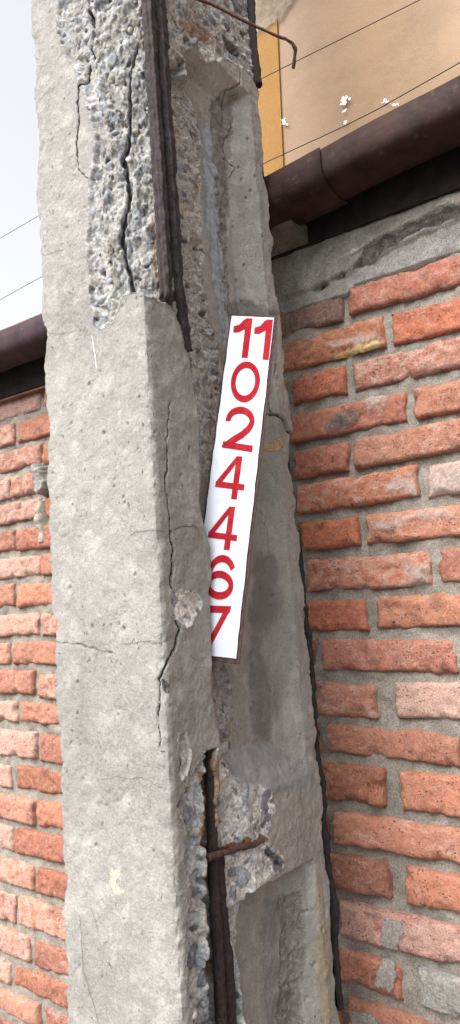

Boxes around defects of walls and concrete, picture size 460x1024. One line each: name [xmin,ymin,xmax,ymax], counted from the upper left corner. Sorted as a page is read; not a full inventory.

crack [76,1,138,293]
spalling [55,0,259,482]
crack [60,399,206,752]
corrosion [205,959,214,978]
spalling [177,661,286,1024]
corrosion [198,756,268,852]